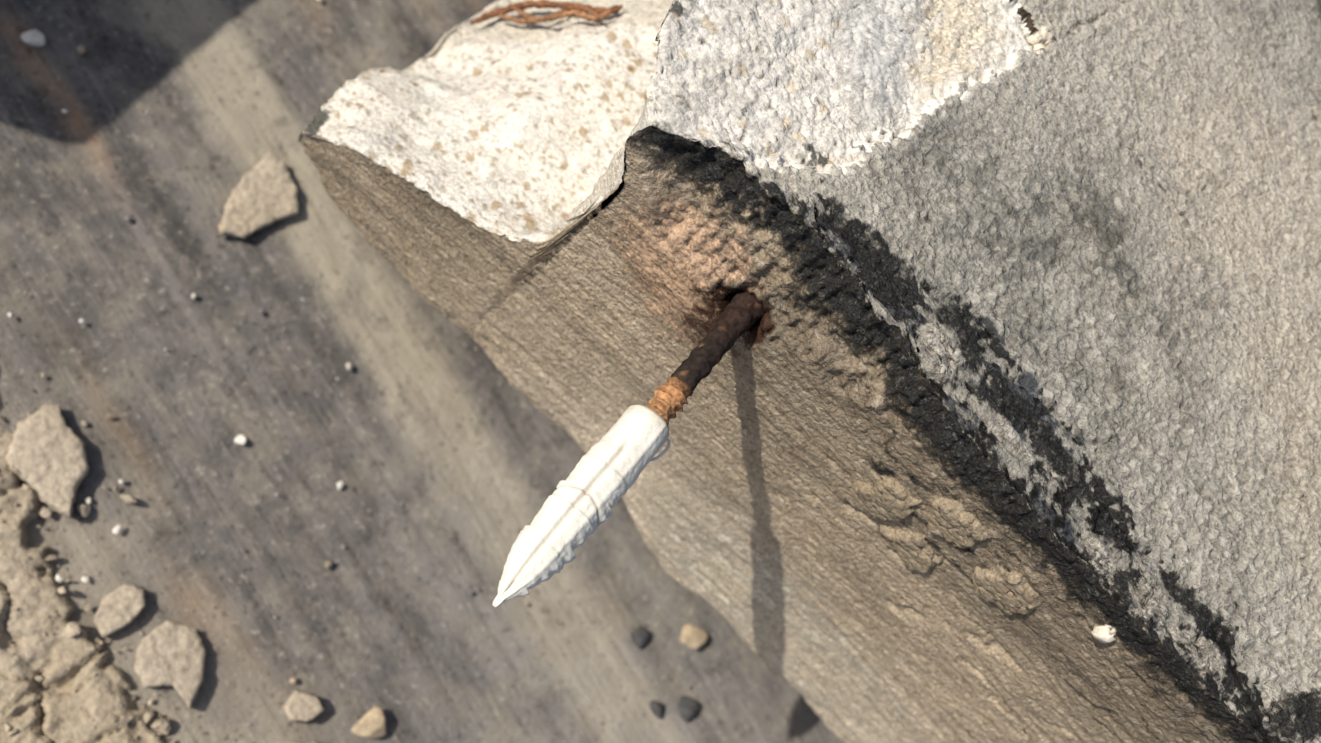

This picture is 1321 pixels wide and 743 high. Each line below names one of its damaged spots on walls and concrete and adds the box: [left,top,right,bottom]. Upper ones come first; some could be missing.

spalling [303,0,1041,243]
crack [1009,0,1124,51]
corrosion [681,283,774,358]
leakage [626,126,1321,743]